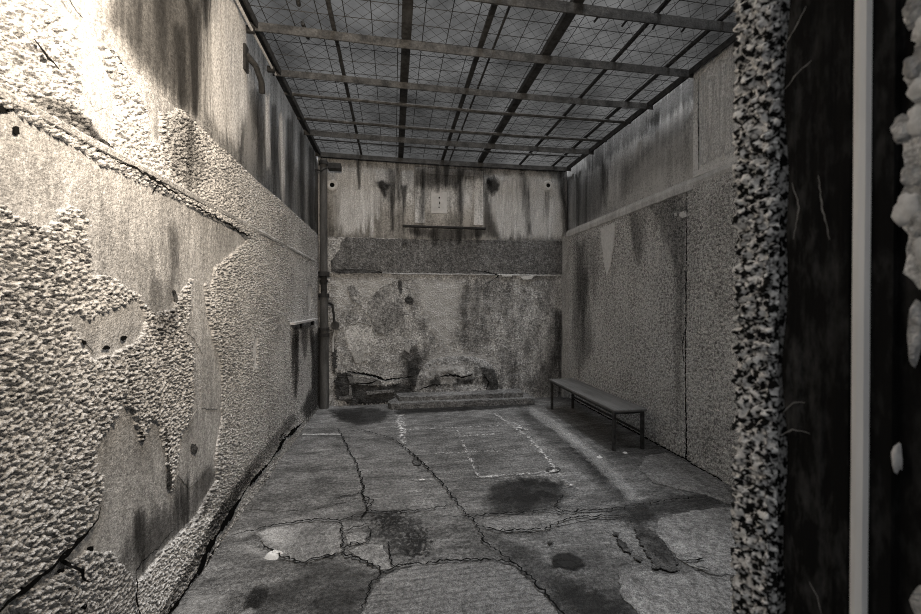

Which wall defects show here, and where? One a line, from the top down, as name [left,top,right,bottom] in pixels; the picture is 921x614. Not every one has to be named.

flaking render [39,0,175,150]
water stain [113,0,314,230]
water stain [336,152,406,237]
water stain [417,165,567,239]
flaking render [0,105,246,614]
spalling [331,343,421,405]
flaking render [344,280,414,363]
crack [168,192,722,614]
water stain [489,478,562,512]
crack [0,506,102,612]
crack [136,527,176,614]
water stain [552,553,585,570]